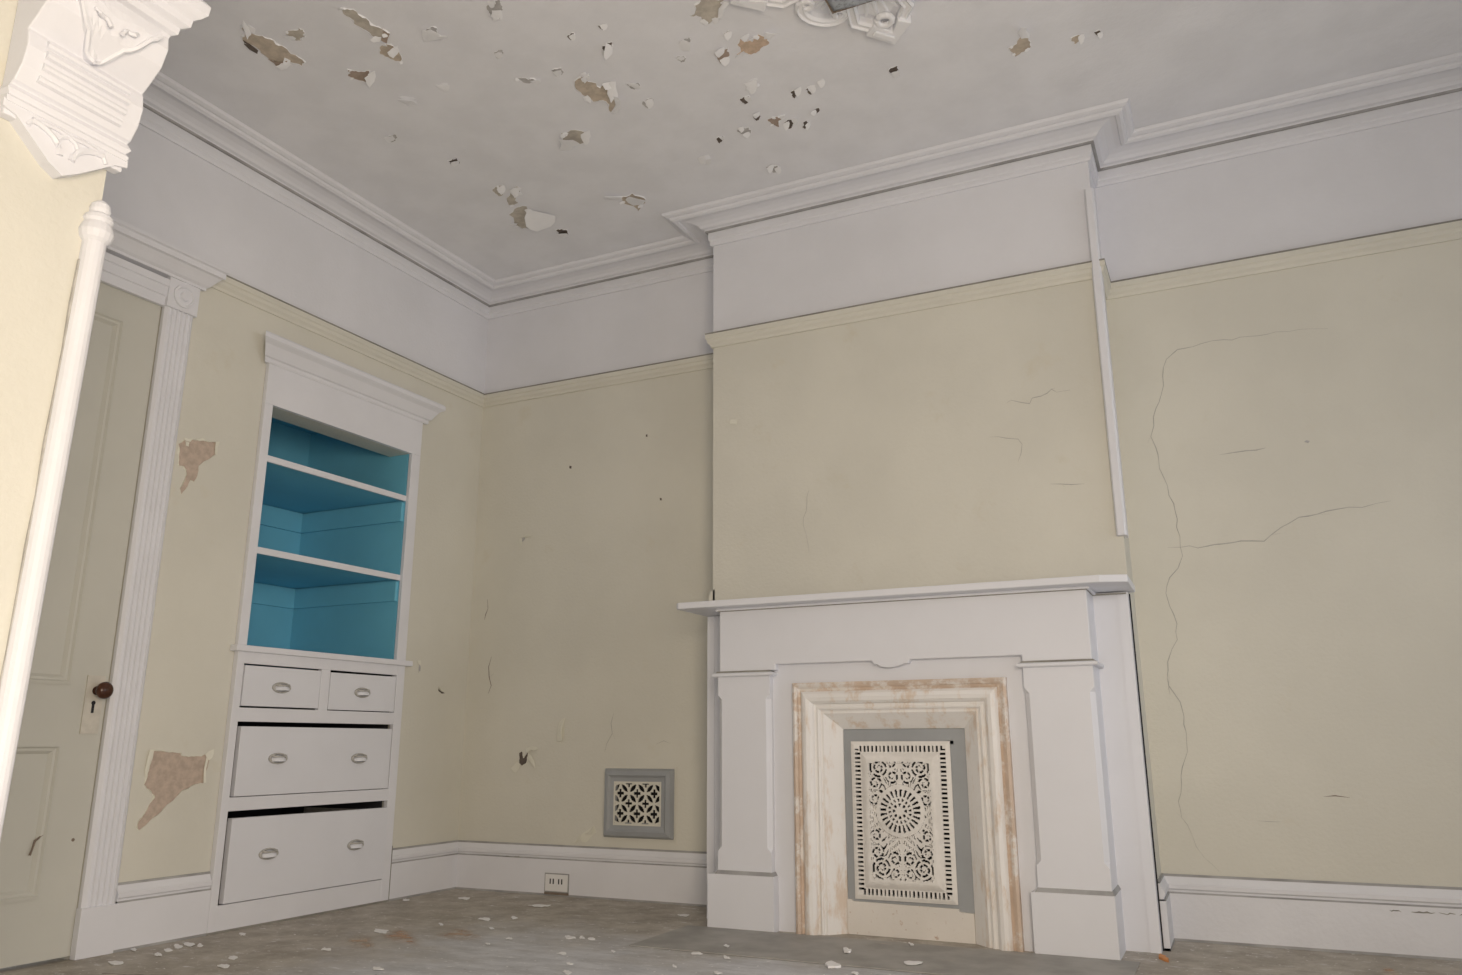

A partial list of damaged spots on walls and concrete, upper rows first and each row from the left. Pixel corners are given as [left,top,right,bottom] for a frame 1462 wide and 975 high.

peeling [240,21,306,70]
peeling [338,7,403,64]
peeling [692,0,780,66]
peeling [1007,27,1031,57]
peeling [347,69,376,88]
peeling [559,130,591,150]
peeling [514,67,654,113]
peeling [716,79,825,144]
peeling [491,185,569,238]
flaking render [177,437,220,494]
crack [1151,328,1388,861]
flaking render [136,749,214,831]